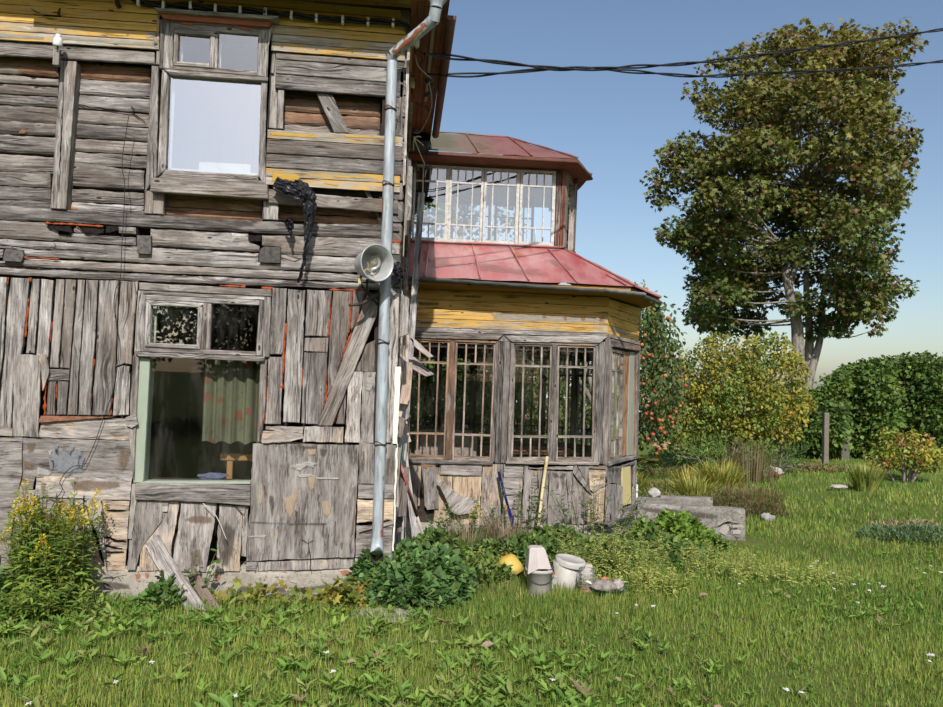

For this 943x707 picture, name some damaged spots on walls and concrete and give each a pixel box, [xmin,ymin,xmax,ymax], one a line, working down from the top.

peeling [62,16,159,48]
peeling [272,172,300,181]
peeling [450,313,627,336]